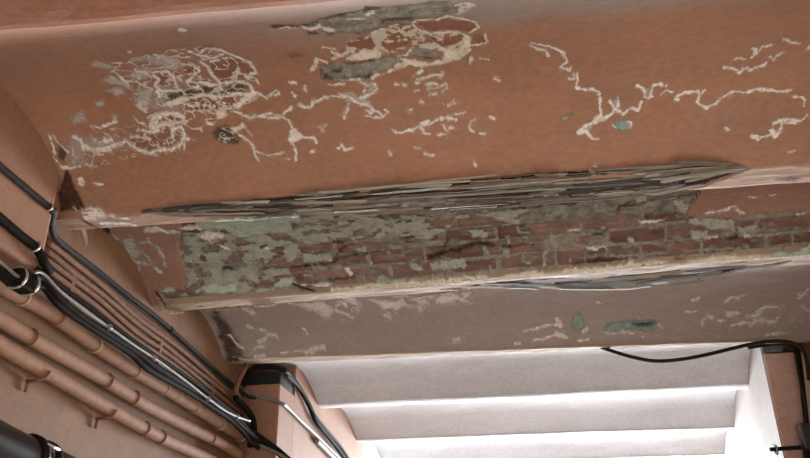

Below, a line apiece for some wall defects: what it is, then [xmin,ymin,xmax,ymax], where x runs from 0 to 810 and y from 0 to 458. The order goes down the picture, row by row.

peeling [49,47,280,217]
spalling [271,0,489,86]
crack [529,42,806,140]
flaking render [141,160,810,314]
spalling [602,320,663,339]